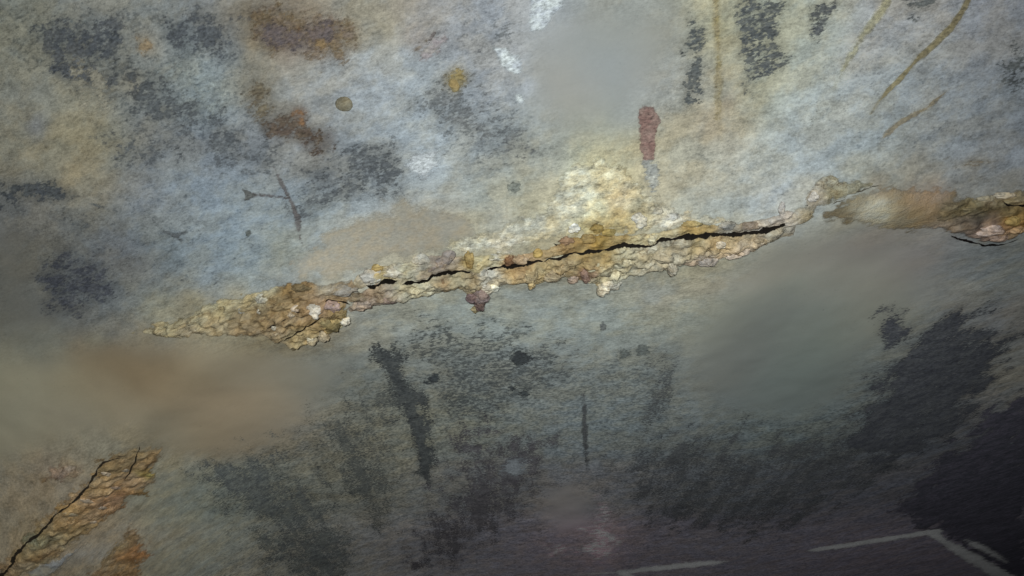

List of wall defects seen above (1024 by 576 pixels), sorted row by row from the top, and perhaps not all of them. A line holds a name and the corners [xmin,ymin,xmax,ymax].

rust [251,2,357,64]
water stain [681,20,706,105]
water stain [734,0,790,95]
rust [879,0,970,101]
rust [638,107,661,161]
crack [366,223,785,289]
spalling [133,175,1024,351]
crack [952,236,1016,246]
water stain [181,318,573,576]
water stain [603,299,1024,576]
crack [0,447,140,576]
spalling [0,448,161,576]